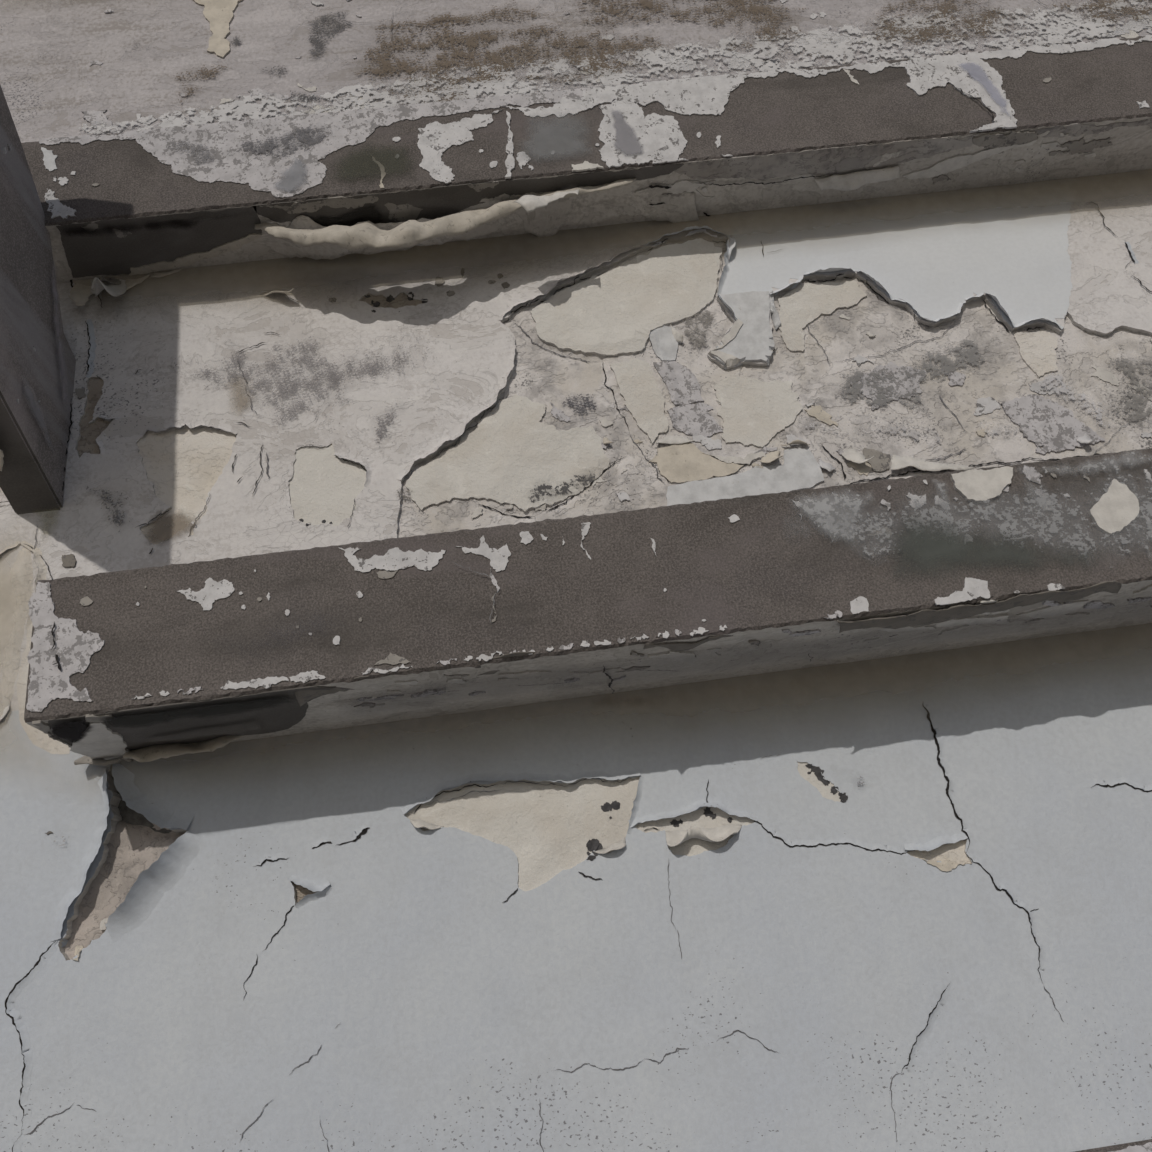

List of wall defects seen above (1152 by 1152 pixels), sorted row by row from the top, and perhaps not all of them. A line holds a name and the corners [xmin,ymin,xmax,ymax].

damp [78,0,1152,134]
peeling [39,14,1152,623]
peeling [782,577,1152,643]
spalling [26,581,758,961]
crack [749,812,923,854]
crack [922,702,1064,1022]
crack [1086,777,1152,792]
crack [243,906,293,997]
crack [5,935,95,1152]
crack [890,982,956,1140]
peeling [1110,1142,1152,1152]